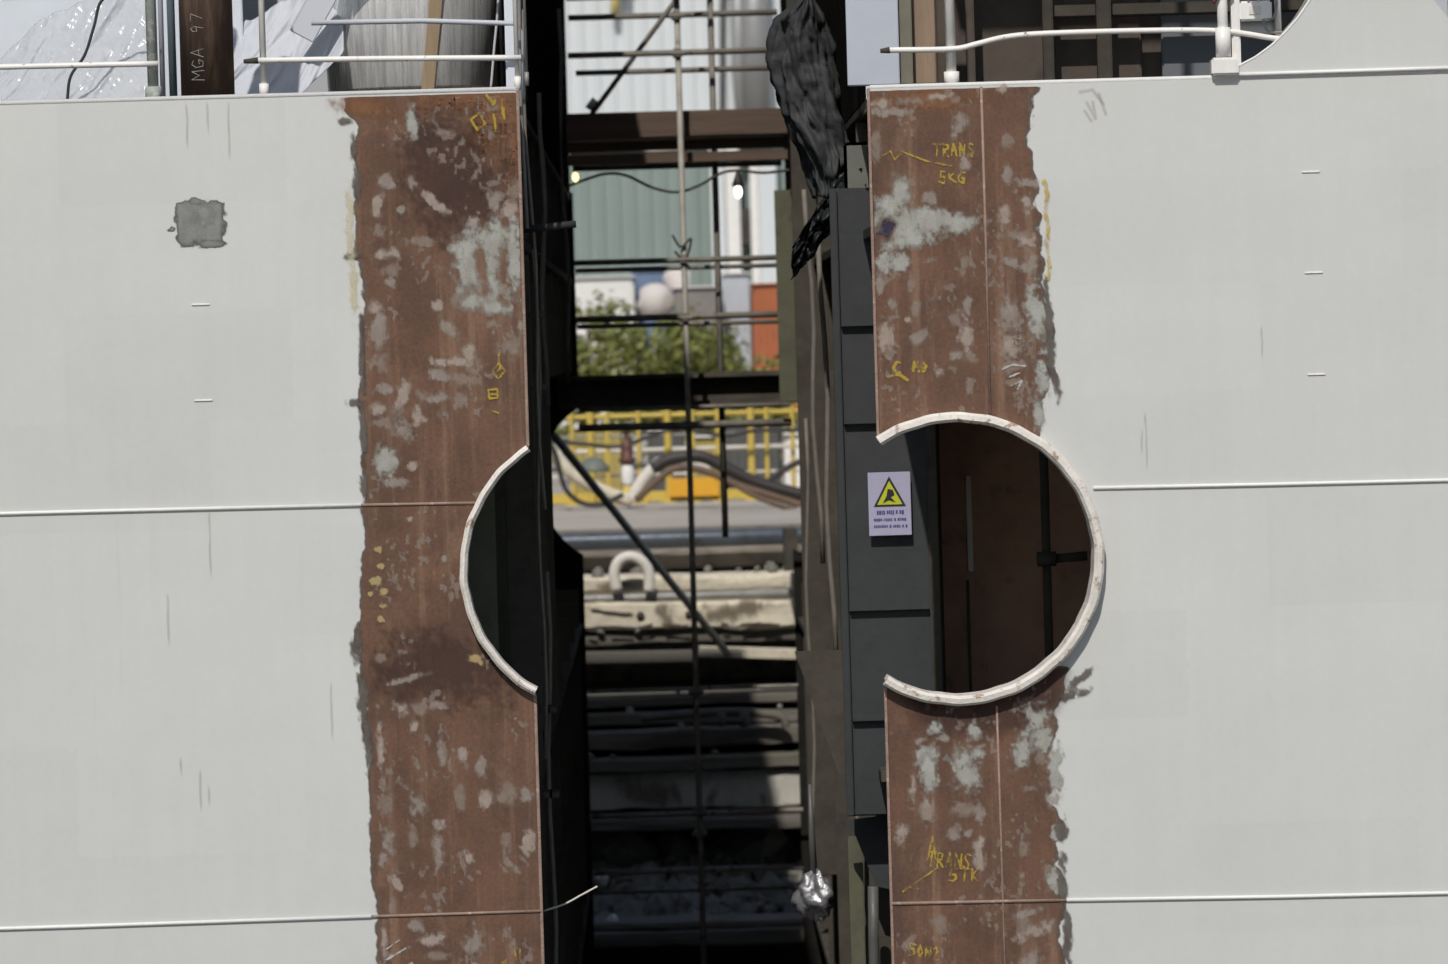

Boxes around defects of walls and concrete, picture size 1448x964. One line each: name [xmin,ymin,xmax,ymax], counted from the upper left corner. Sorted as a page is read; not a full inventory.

corrosion [873,88,986,110]
peeling [167,197,227,248]
corrosion [405,93,519,236]
peeling [1000,167,1038,223]
peeling [1000,236,1049,426]
peeling [367,545,388,623]
corrosion [378,632,501,701]
corrosion [918,669,1059,731]
peeling [1012,706,1063,807]
peeling [379,833,403,891]
peeling [1047,867,1060,894]
peeling [1017,908,1052,964]